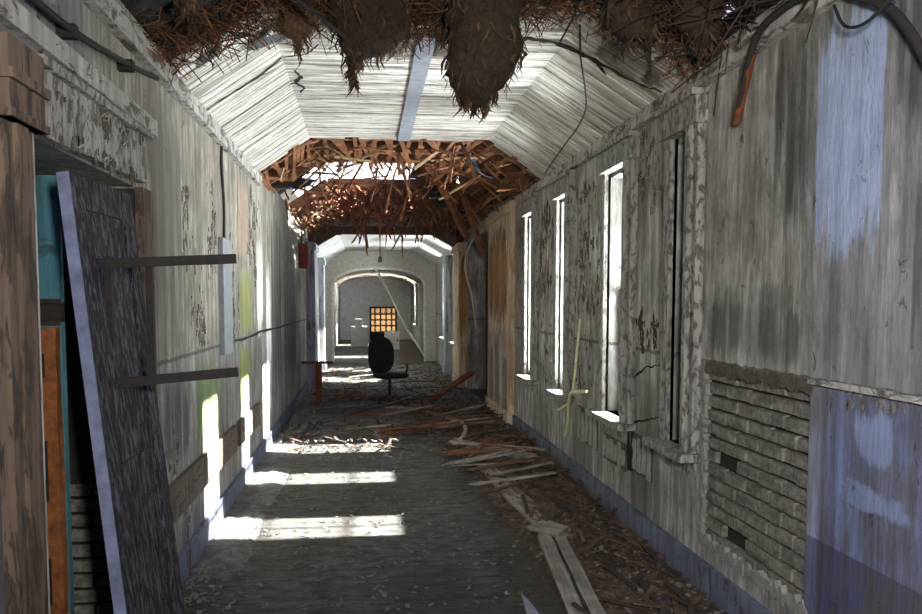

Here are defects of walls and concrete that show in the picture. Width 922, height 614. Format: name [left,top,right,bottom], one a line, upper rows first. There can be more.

peeling [44,69,147,187]